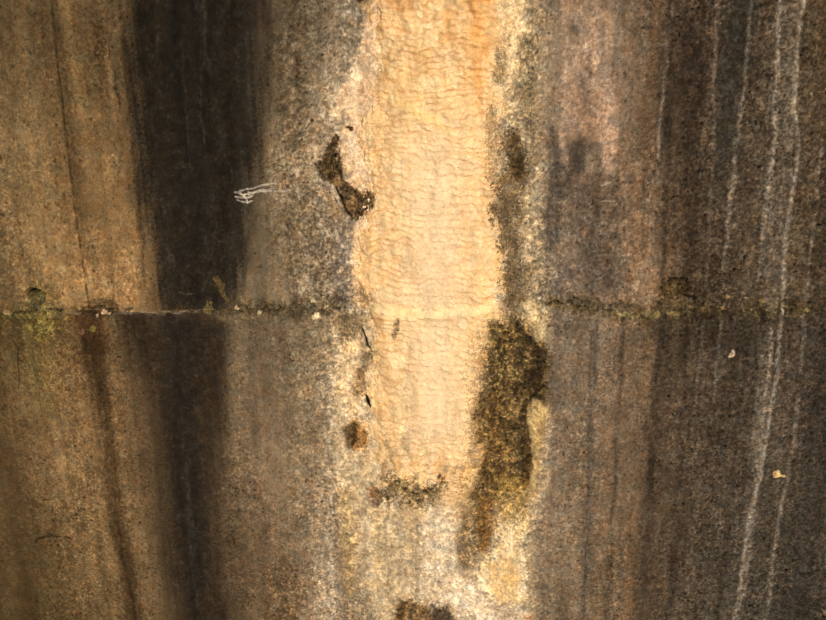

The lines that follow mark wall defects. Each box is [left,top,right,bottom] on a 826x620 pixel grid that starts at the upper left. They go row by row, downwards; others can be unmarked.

water stain [106,0,280,620]
spalling [313,125,379,226]
spalling [340,417,371,454]
water stain [313,0,621,620]
water stain [602,317,627,620]
water stain [654,0,678,300]
water stain [628,318,724,620]
water stain [682,0,826,620]